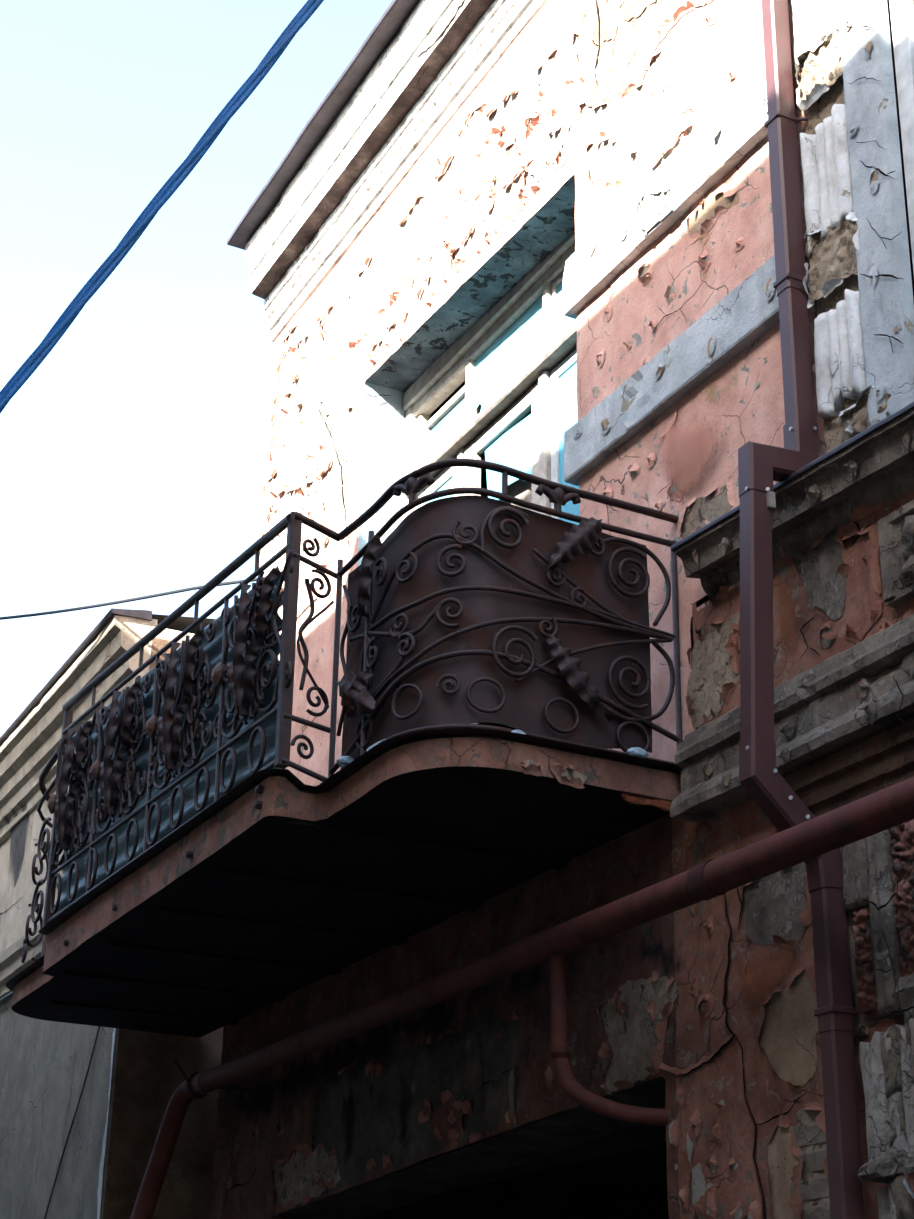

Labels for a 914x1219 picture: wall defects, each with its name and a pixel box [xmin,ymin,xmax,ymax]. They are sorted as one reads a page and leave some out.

crack [591,0,624,86]
spalling [795,16,851,111]
peeling [260,0,717,591]
spalling [686,187,739,273]
spalling [803,212,878,308]
crack [316,405,349,543]
spalling [653,479,740,568]
spalling [791,525,914,650]
spalling [685,594,740,728]
peeling [596,970,679,1095]
crack [660,887,806,1219]
peeling [668,950,831,1219]